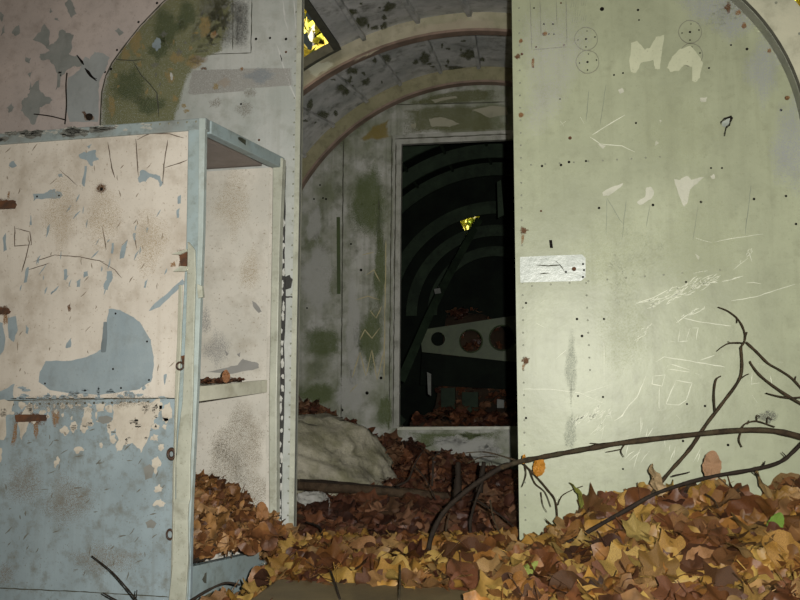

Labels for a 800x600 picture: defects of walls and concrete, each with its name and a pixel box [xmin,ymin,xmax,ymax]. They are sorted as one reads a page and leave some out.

peeling [629,35,703,82]
peeling [0,8,128,186]
water stain [403,89,505,134]
peeling [33,189,62,199]
peeling [138,170,163,187]
peeling [674,174,715,206]
peeling [103,271,113,290]
peeling [149,279,184,311]
peeling [0,309,172,507]
corrosion [11,409,60,446]